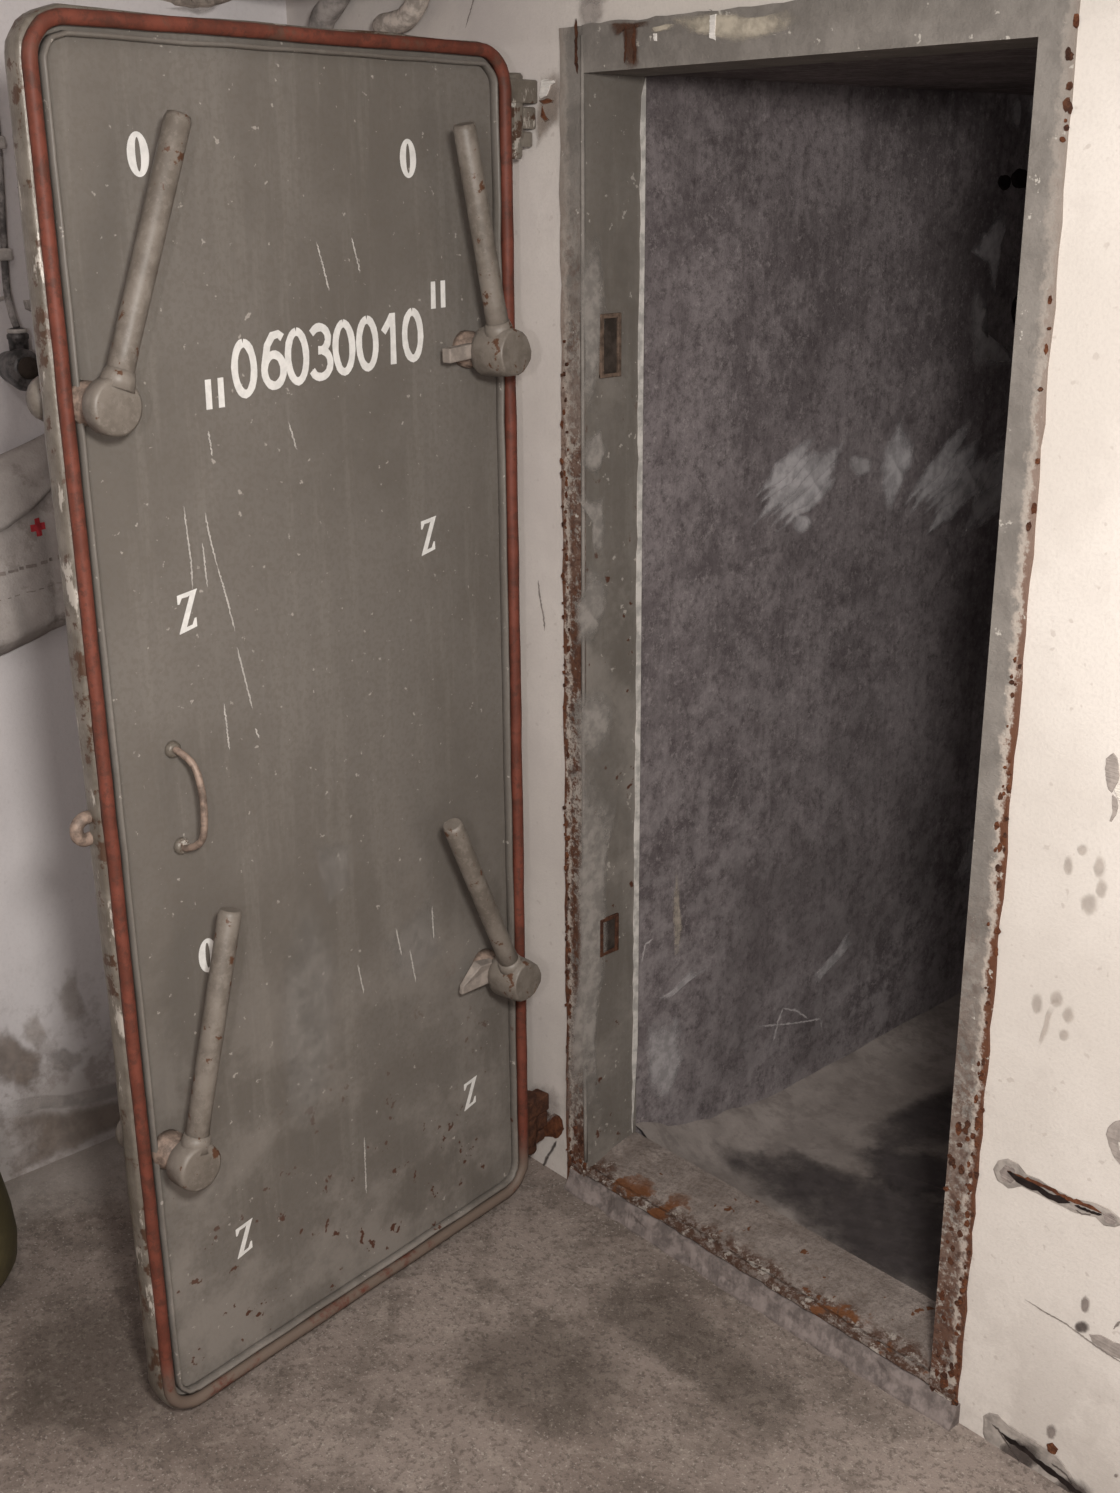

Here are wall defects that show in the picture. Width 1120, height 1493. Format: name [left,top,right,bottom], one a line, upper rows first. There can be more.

flaking render [163,0,231,8]
corrosion [612,22,643,64]
corrosion [1059,81,1073,143]
corrosion [560,362,570,687]
peeling [1105,753,1120,822]
corrosion [994,760,1012,891]
damp [0,1037,36,1084]
damp [31,1104,120,1162]
corrosion [543,1037,587,1170]
peeling [1106,1120,1120,1164]
corrosion [930,1058,985,1406]
crack [1026,1300,1120,1362]